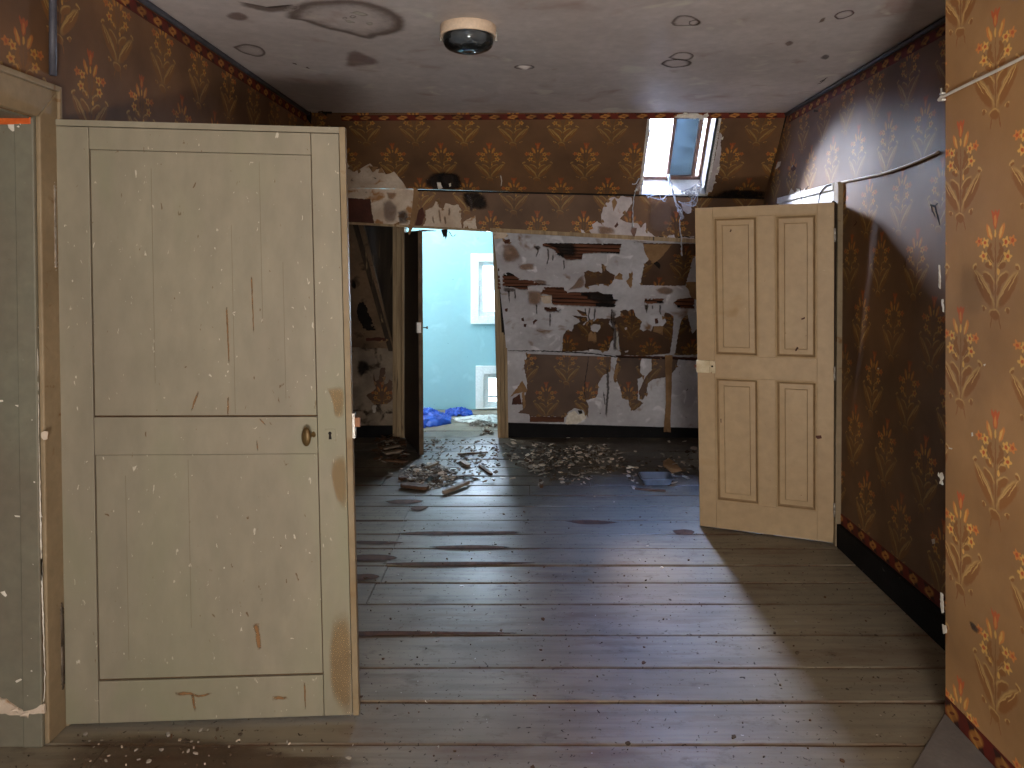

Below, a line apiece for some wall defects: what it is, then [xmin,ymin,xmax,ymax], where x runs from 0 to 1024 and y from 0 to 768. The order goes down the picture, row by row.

leakage [245,1,402,38]
flaking render [348,198,374,223]
flaking render [493,231,512,244]
flaking render [543,242,621,260]
flaking render [498,268,630,327]
flaking render [644,284,695,319]
flaking render [357,302,388,343]
flaking render [564,410,586,424]
peeling [0,384,48,718]